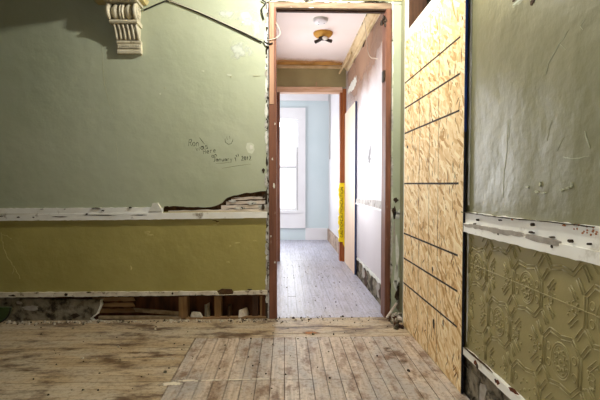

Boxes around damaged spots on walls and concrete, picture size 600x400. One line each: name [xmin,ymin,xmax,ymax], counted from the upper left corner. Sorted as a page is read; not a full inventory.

spalling [164,173,275,209]
flaking render [0,204,275,321]
flaking render [463,224,562,400]